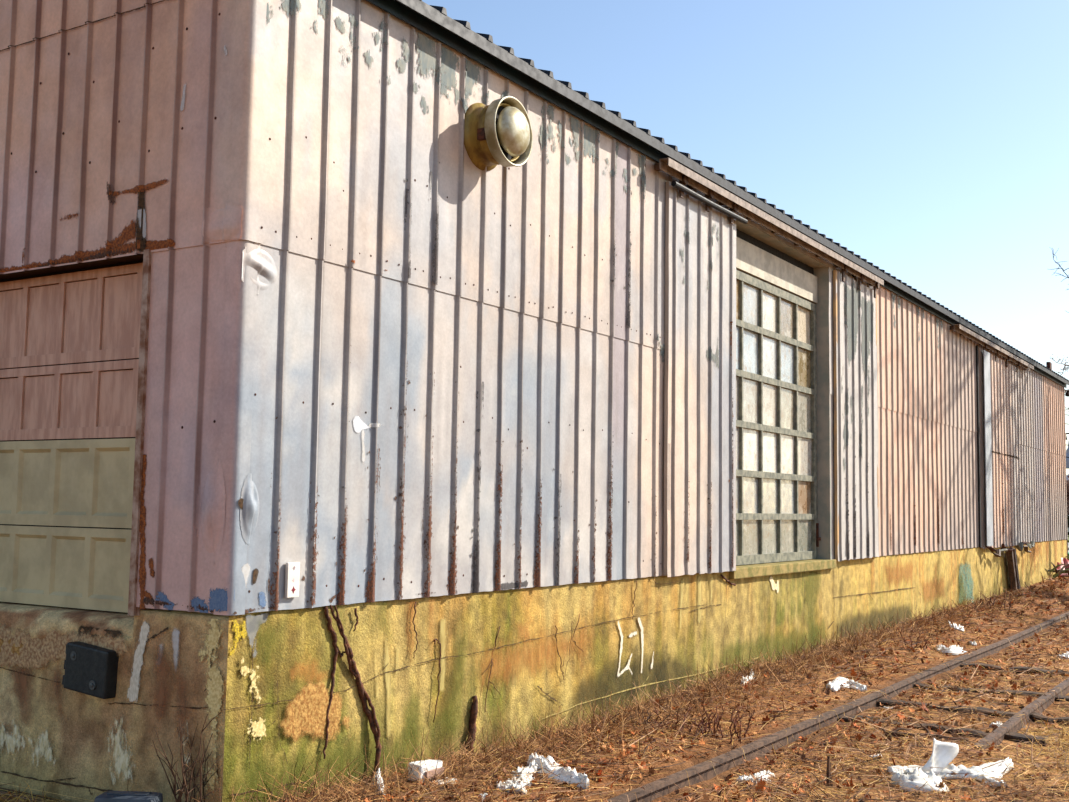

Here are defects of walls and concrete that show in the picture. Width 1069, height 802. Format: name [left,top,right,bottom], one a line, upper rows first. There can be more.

peeling [266,0,301,26]
peeling [310,0,390,69]
peeling [539,105,646,201]
peeling [842,280,874,470]
rust [329,486,348,605]
rust [447,442,459,595]
rust [471,512,480,593]
rust [494,463,562,591]
rust [574,446,613,584]
damp [839,608,911,636]
damp [376,640,400,736]
damp [579,661,684,704]